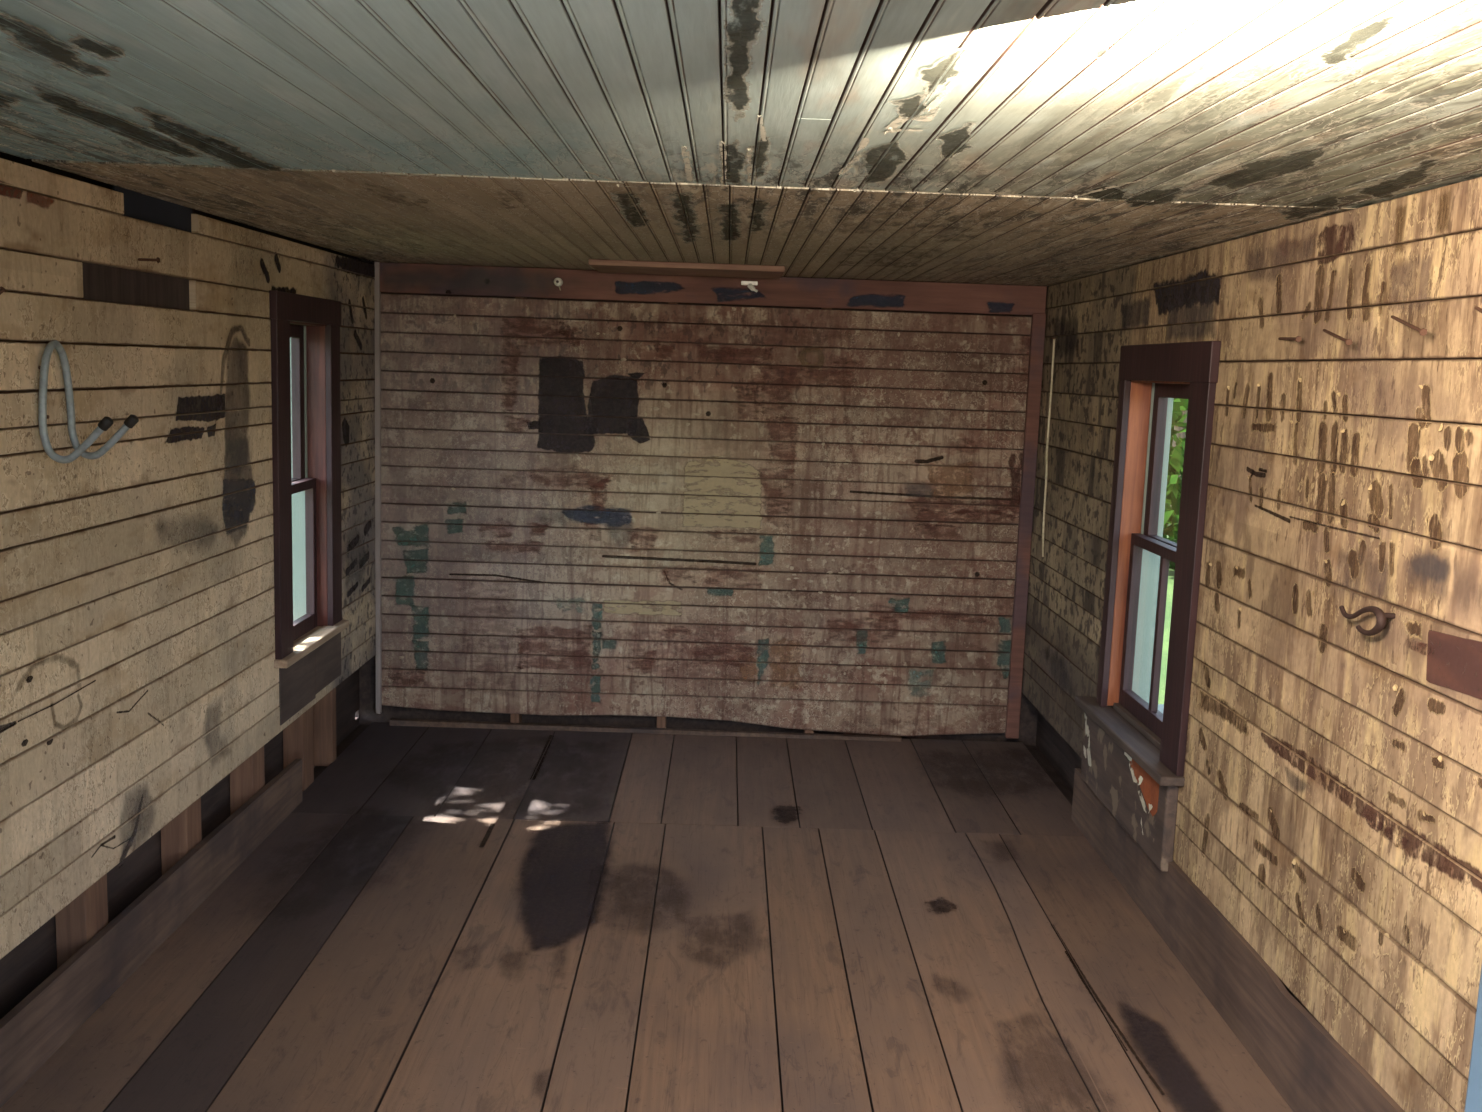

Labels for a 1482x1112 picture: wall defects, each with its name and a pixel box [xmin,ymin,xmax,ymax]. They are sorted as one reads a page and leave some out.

water stain [0,13,125,77]
water stain [723,0,764,122]
water stain [892,48,969,118]
water stain [1315,14,1398,66]
water stain [0,86,287,172]
water stain [718,137,771,183]
water stain [862,141,908,183]
water stain [937,122,976,159]
water stain [1248,159,1441,329]
peeling [1124,752,1159,834]
water stain [520,823,609,949]
water stain [1123,1007,1221,1112]